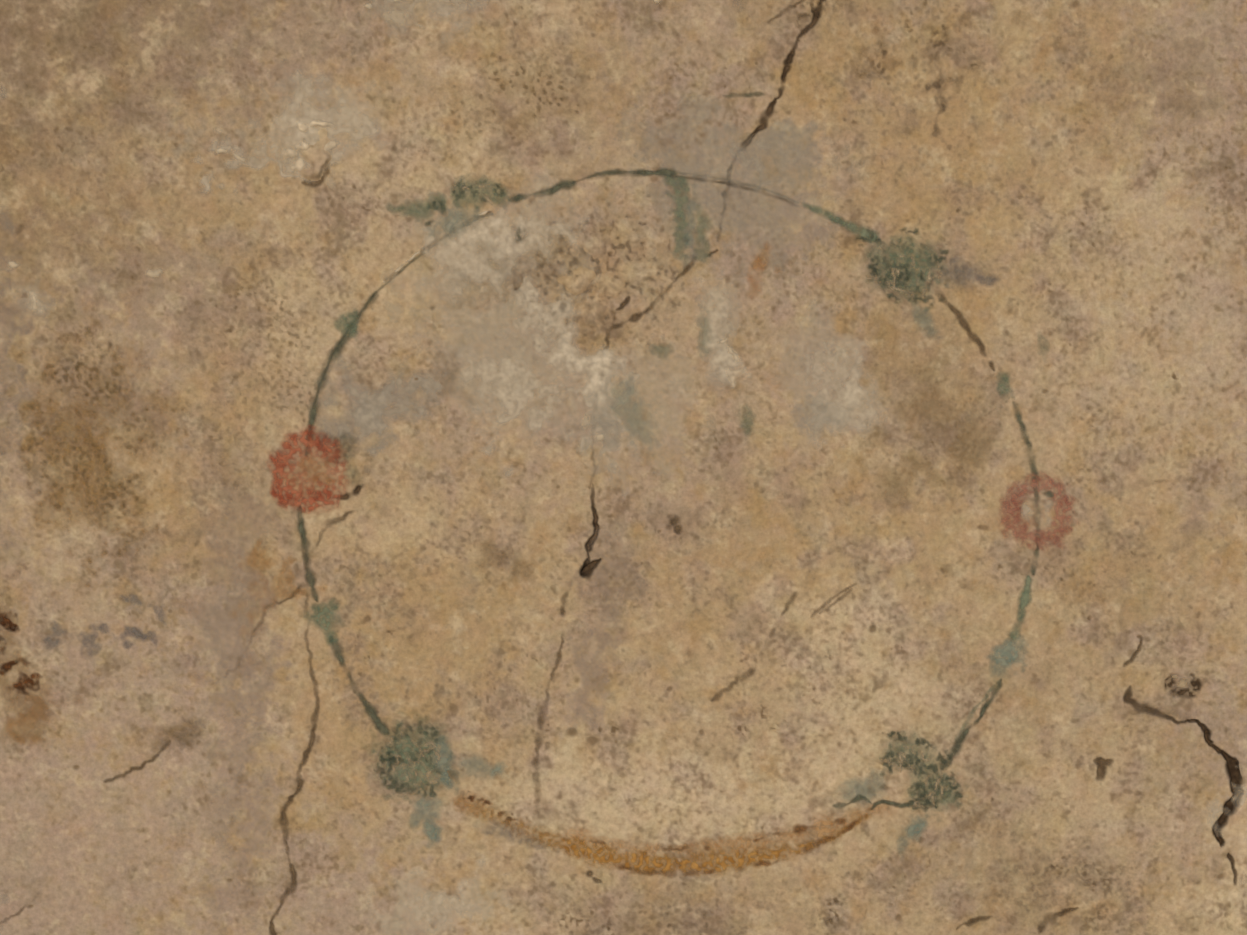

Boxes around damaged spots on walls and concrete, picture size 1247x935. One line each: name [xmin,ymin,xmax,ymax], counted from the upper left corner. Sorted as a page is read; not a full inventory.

crack [723,0,824,198]
flaking render [287,120,336,186]
crack [676,250,718,279]
crack [603,297,653,376]
crack [580,496,601,577]
crack [254,588,299,631]
crack [1124,638,1142,703]
crack [270,671,318,935]
crack [1164,715,1243,883]